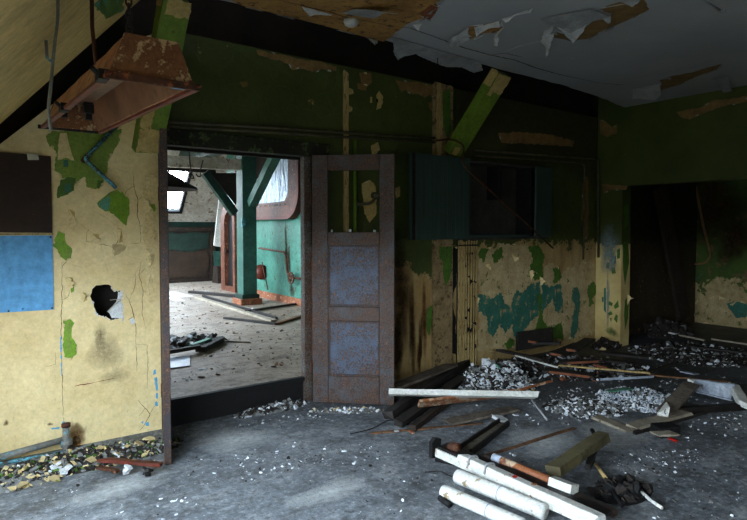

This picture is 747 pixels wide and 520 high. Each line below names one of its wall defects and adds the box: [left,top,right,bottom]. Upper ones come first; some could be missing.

peeling [302,7,330,16]
peeling [390,8,533,98]
peeling [540,9,611,58]
peeling [46,129,122,198]
peeling [53,231,72,262]
peeling [97,190,130,256]
peeling [60,319,78,376]
spalling [65,276,135,324]
crack [126,265,148,386]
leakage [395,252,426,372]
peeling [452,240,633,366]
flaking render [694,295,747,328]